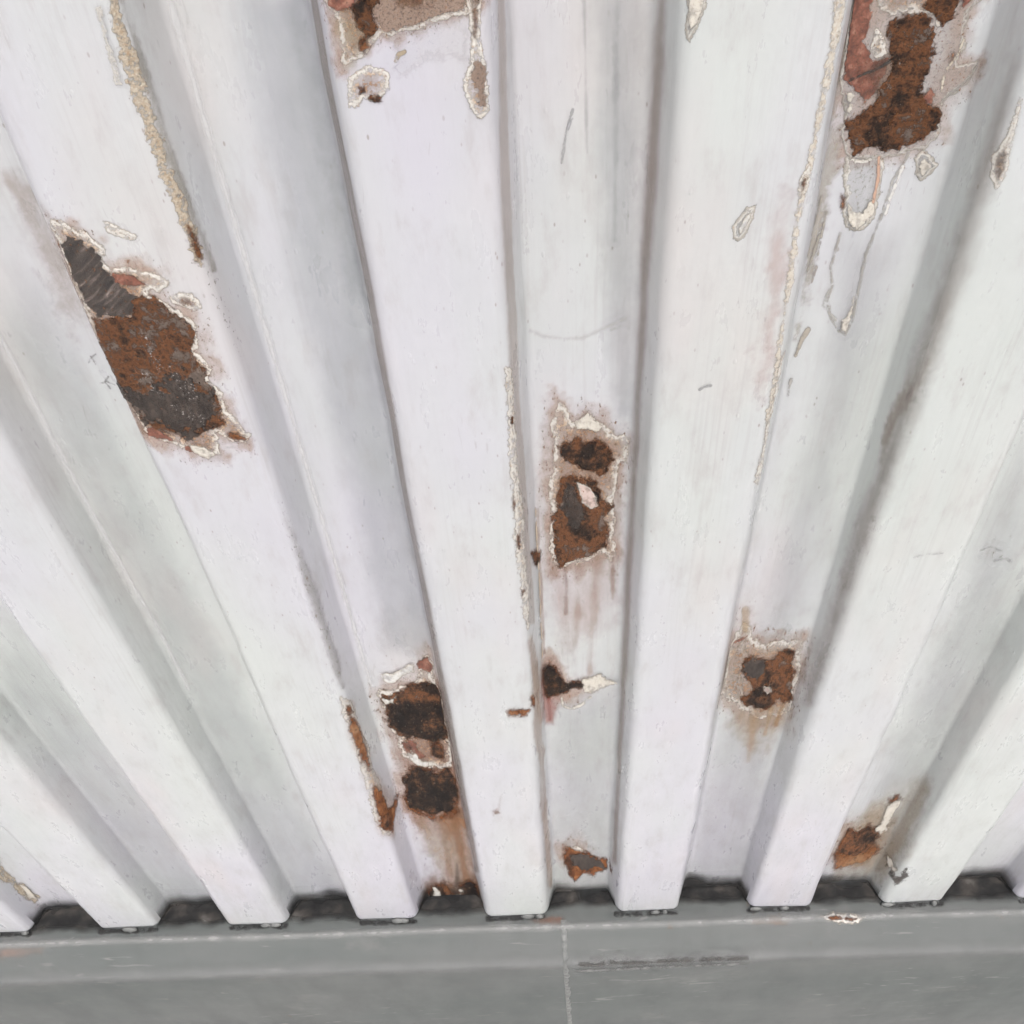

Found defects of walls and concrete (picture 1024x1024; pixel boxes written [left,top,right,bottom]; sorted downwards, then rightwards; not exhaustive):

peeling [96,0,217,285]
peeling [347,50,407,108]
peeling [463,0,490,119]
rust [832,0,981,171]
peeling [755,0,939,485]
rust [45,215,251,464]
peeling [504,367,543,657]
rust [538,393,632,577]
rust [340,646,480,905]
rust [507,660,617,717]
rust [721,619,809,729]
rust [826,795,908,885]